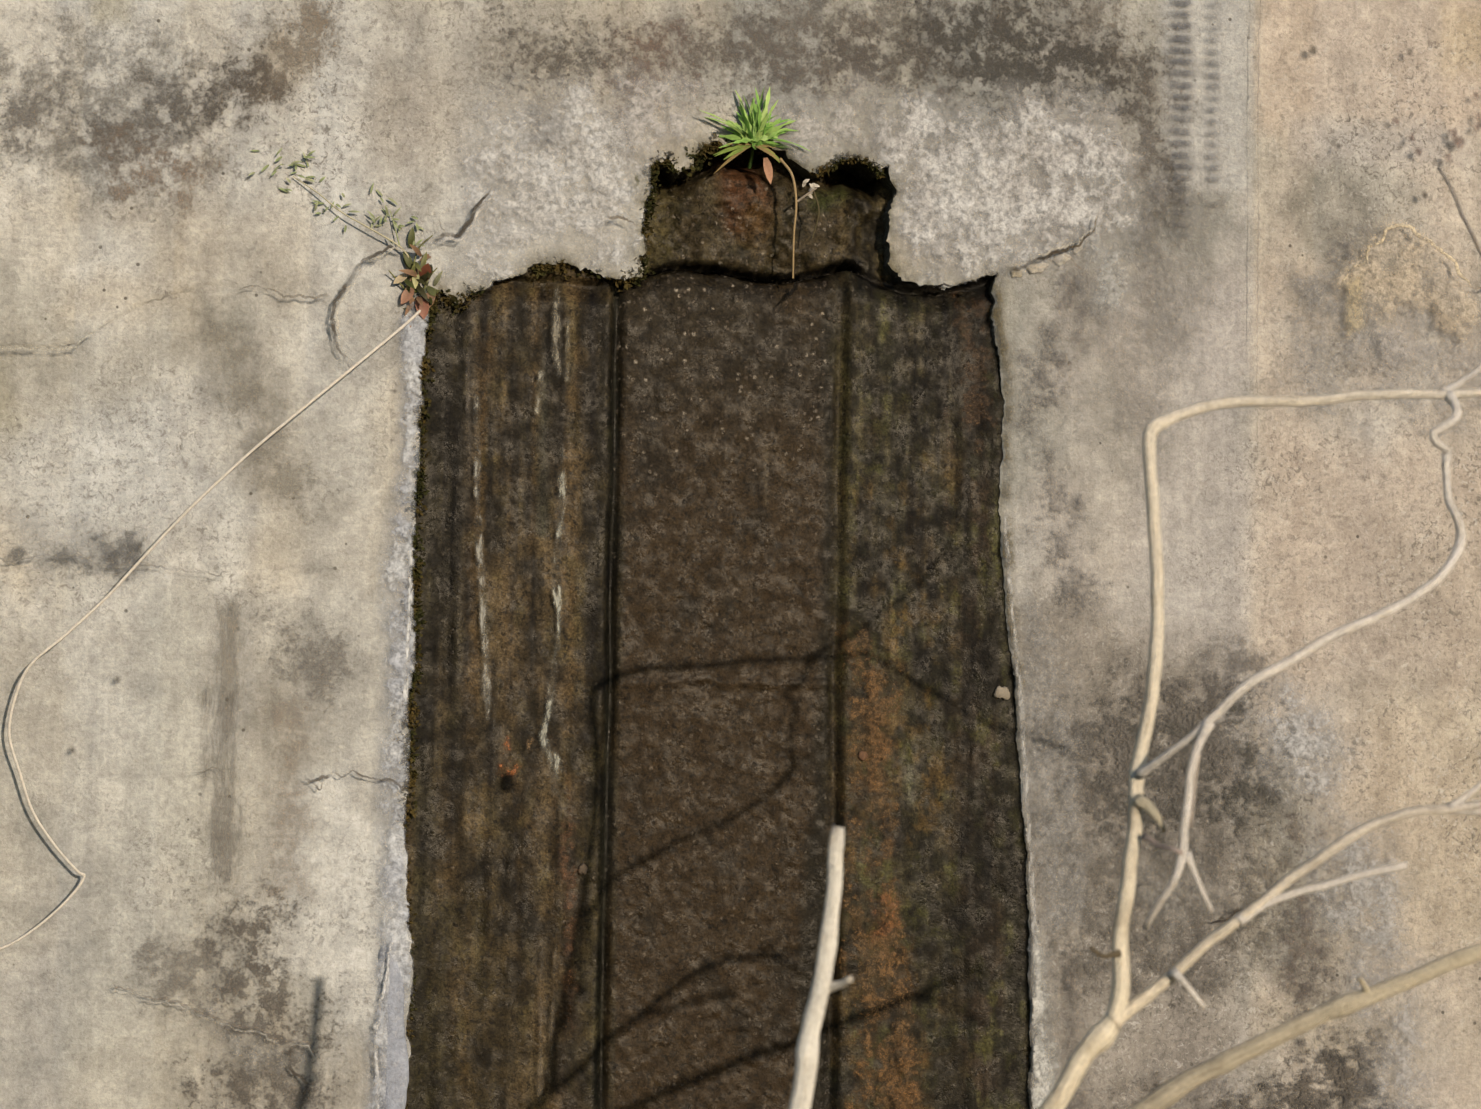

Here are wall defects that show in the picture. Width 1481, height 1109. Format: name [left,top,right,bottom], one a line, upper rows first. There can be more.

water stain [92,0,336,203]
crack [242,245,402,355]
crack [440,192,490,241]
spalling [373,151,1083,1109]
rust [835,624,931,1109]
water stain [464,0,1421,1109]